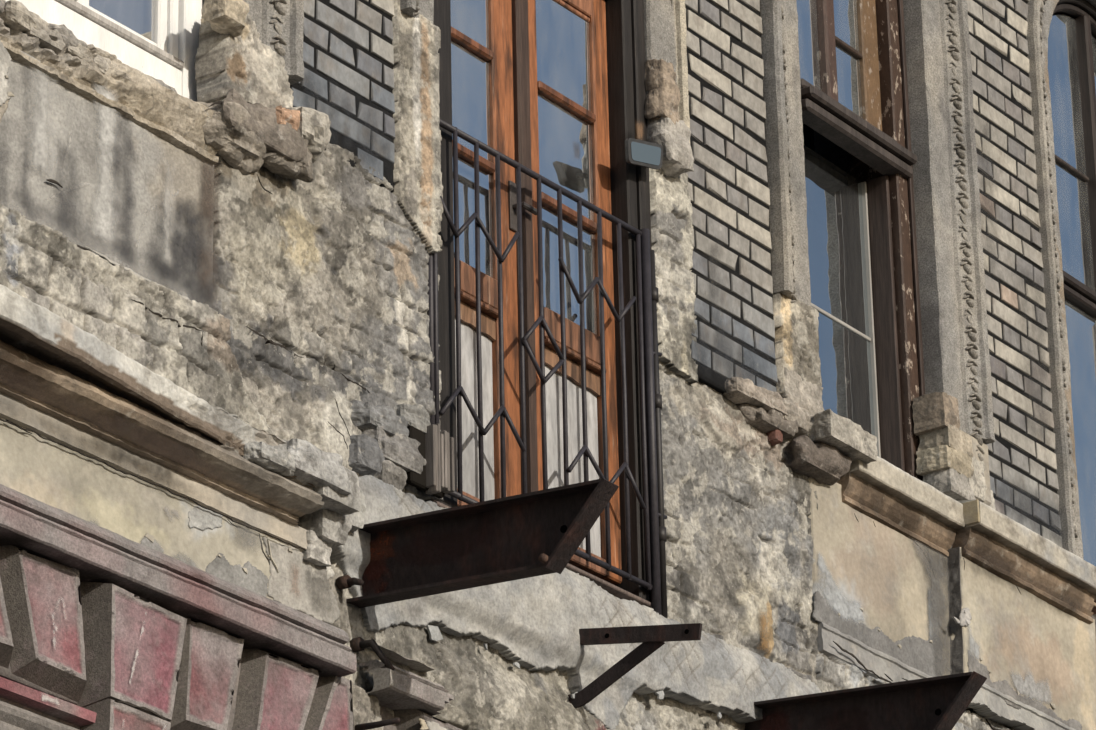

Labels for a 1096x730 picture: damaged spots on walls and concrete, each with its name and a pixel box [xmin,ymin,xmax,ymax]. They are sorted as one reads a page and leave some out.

water stain [33,70,72,168]
water stain [33,87,137,268]
water stain [146,164,215,304]
spalling [0,0,745,730]
spalling [644,59,940,692]
spalling [912,392,996,510]
corrosion [364,530,394,592]
peeling [952,607,1083,730]